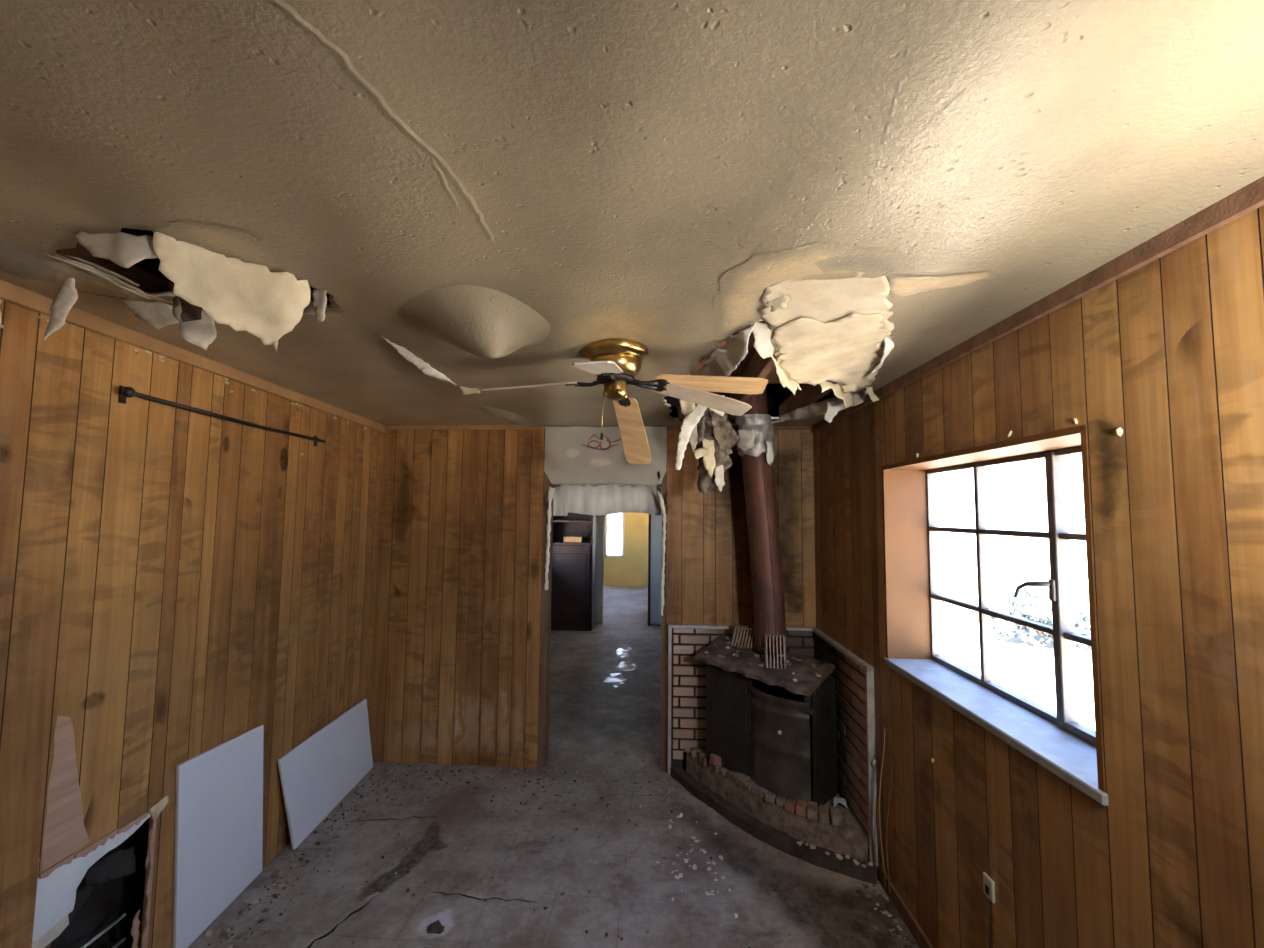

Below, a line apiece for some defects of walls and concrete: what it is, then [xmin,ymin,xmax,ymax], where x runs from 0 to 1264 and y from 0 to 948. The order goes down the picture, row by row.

crack [266,0,495,244]
peeling [460,385,480,395]
hole [32,795,169,948]
crack [300,891,380,948]